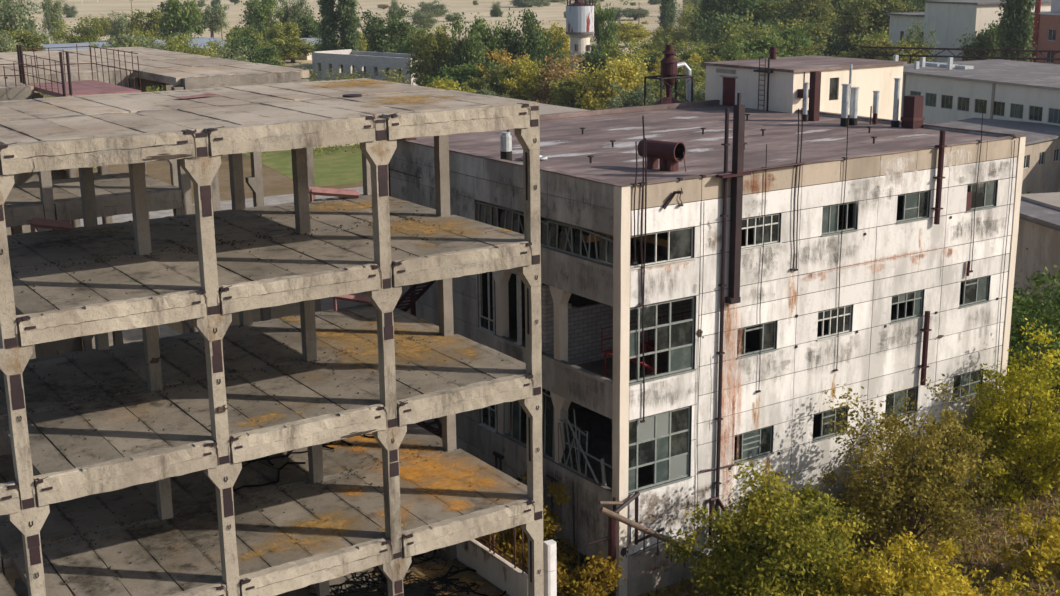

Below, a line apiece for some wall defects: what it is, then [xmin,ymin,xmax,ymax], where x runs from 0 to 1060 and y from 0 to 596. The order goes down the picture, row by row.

corrosion [721,304,759,463]